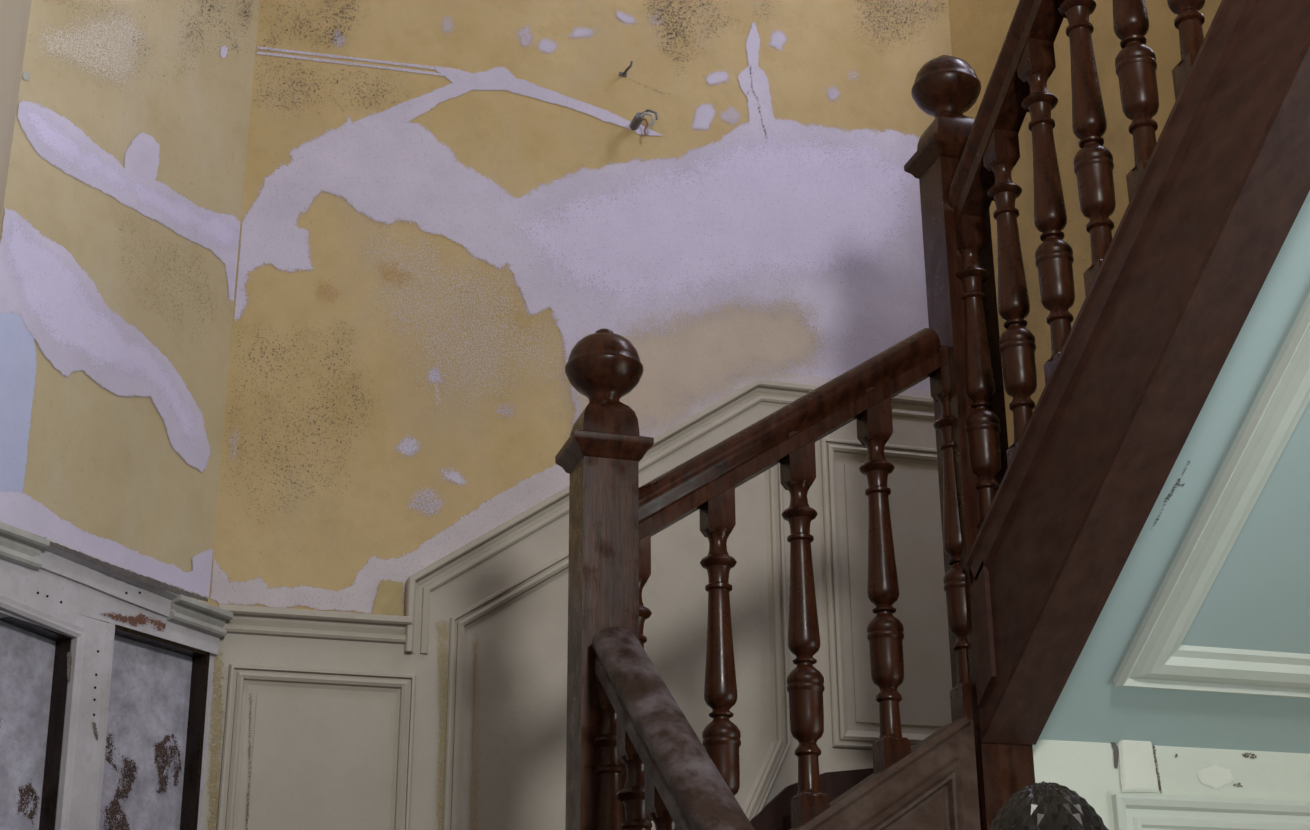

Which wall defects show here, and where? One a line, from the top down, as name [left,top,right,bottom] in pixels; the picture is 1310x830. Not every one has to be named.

leakage [58,0,411,114]
leakage [641,0,783,79]
leakage [849,0,948,54]
peeling [550,281,838,442]
corrosion [102,611,167,632]